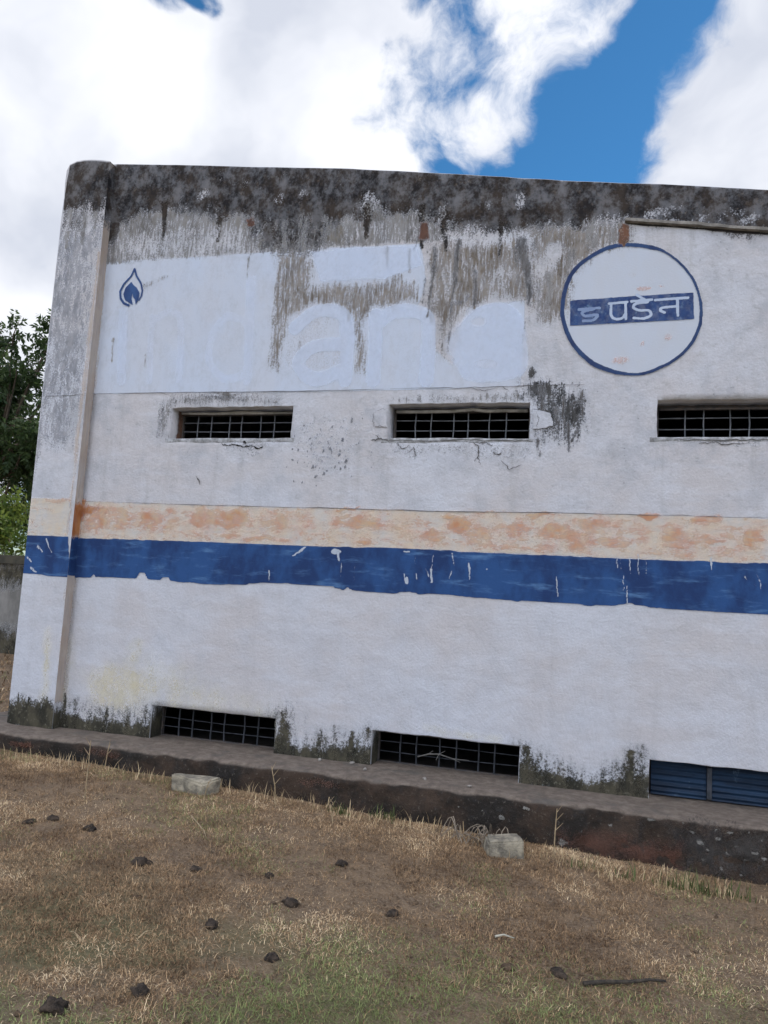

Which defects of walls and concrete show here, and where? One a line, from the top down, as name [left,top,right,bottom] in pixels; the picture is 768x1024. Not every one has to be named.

corrosion [415,222,429,253]
water stain [35,161,768,464]
peeling [82,506,311,556]
peeling [323,507,765,605]
water stain [7,671,163,738]
water stain [273,706,379,765]
water stain [519,743,649,799]